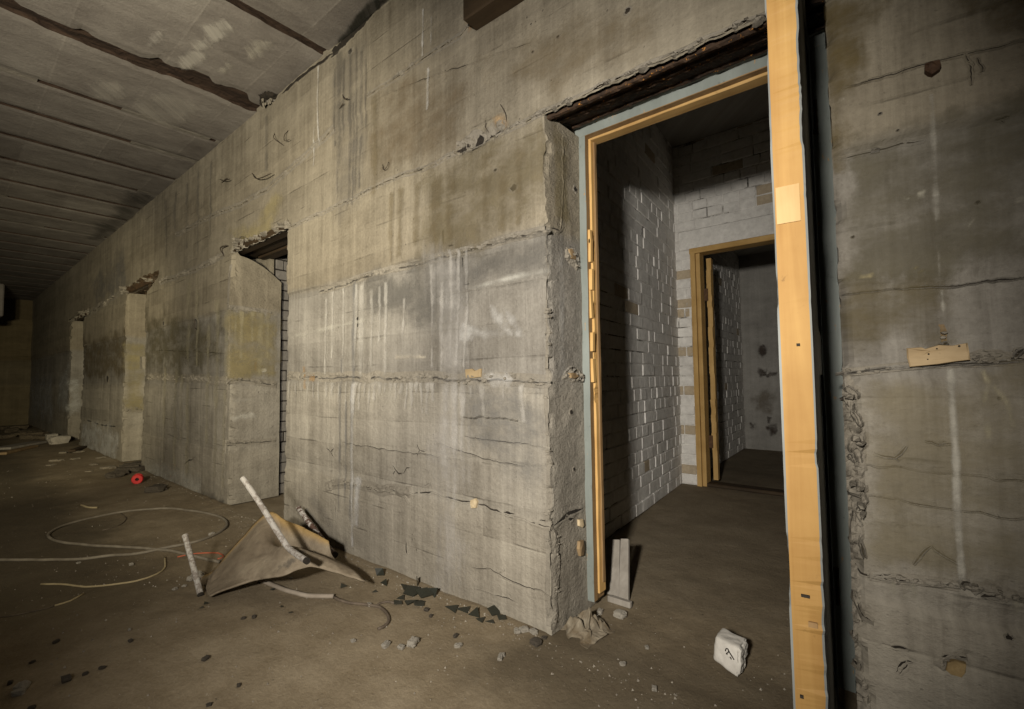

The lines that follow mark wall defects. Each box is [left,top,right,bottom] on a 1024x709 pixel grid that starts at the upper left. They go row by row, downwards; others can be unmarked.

spalling [448,118,512,157]
spalling [230,220,291,254]
spalling [110,270,167,299]
water stain [368,261,481,321]
crack [326,415,583,531]
crack [865,439,1024,521]
water stain [947,370,960,505]
spalling [544,526,561,632]
spalling [839,376,874,709]